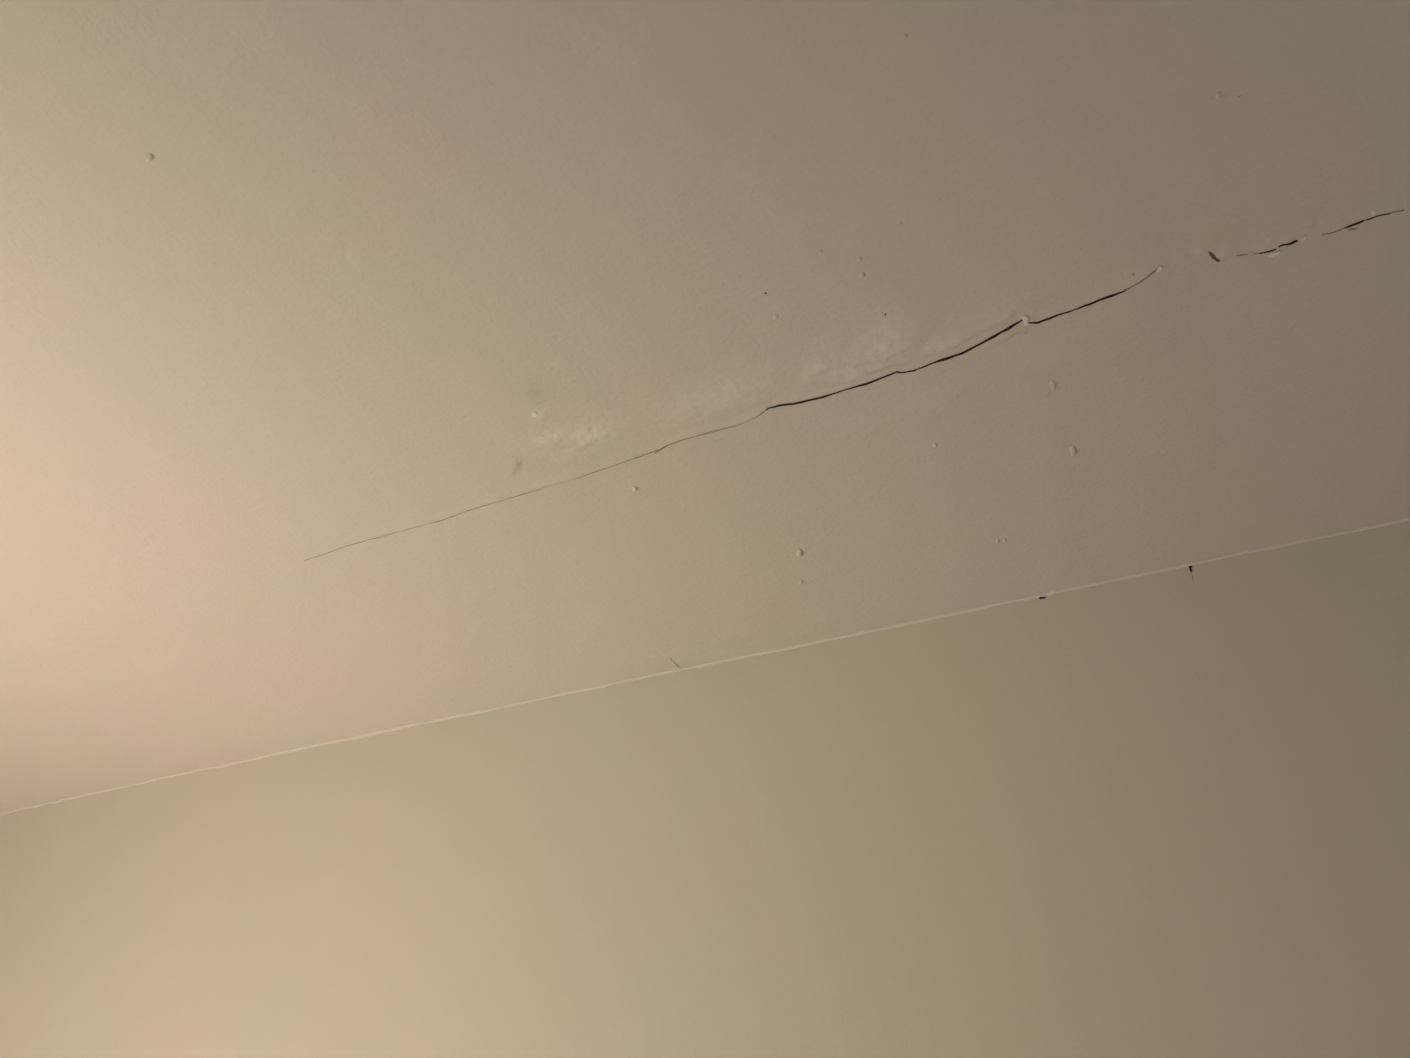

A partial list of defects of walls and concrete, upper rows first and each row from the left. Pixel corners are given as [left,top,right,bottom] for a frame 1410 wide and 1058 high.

crack [304,261,1163,561]